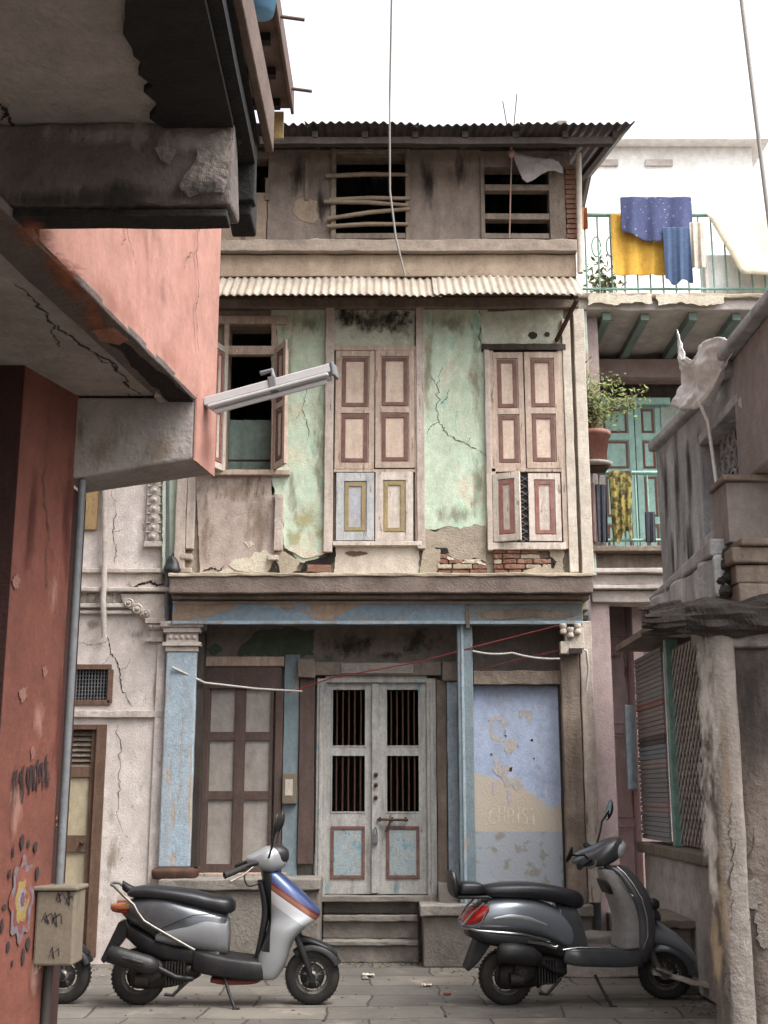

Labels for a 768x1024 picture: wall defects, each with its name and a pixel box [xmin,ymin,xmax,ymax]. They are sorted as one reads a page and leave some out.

spalling [123,0,234,198]
leakage [423,166,433,195]
crack [14,284,144,398]
leakage [340,310,408,332]
crack [427,368,486,456]
peeling [420,524,565,573]
peeling [176,604,235,620]
crack [83,636,132,828]
peeling [489,716,522,804]
peeling [747,877,768,949]